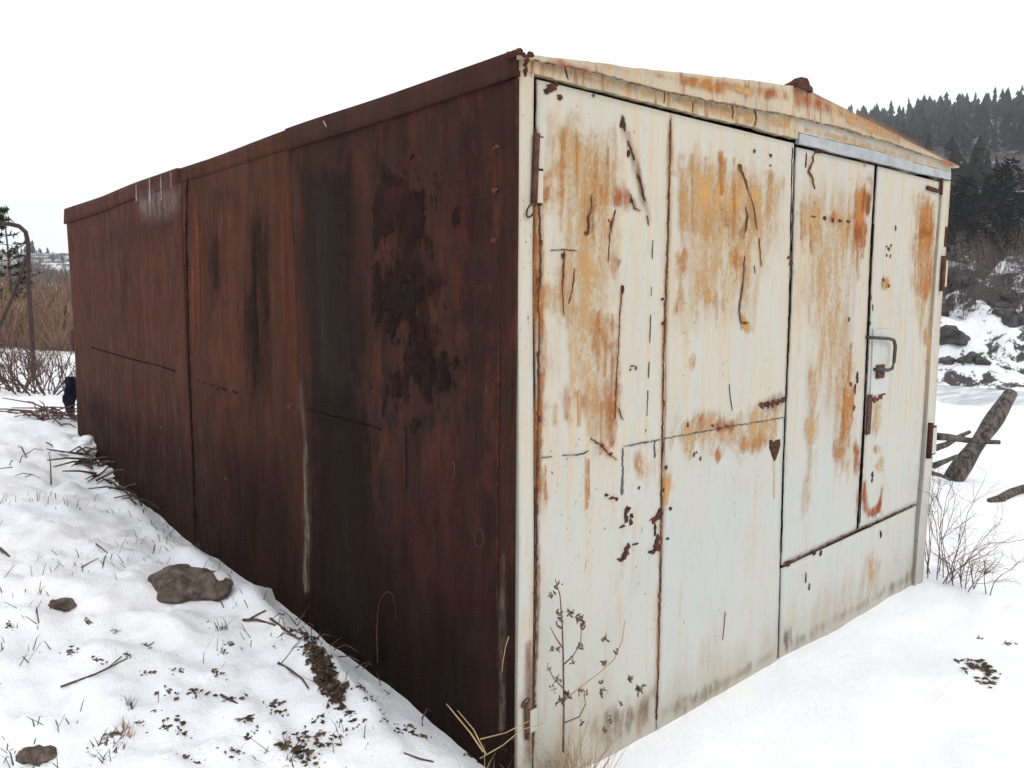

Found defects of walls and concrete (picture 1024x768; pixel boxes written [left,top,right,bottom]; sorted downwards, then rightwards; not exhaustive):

corrosion [683,79,889,137]
corrosion [187,199,201,375]
corrosion [532,125,629,454]
corrosion [680,152,773,305]
corrosion [802,182,873,471]
corrosion [915,195,934,377]
corrosion [533,370,555,499]
corrosion [682,407,781,498]
corrosion [857,483,882,516]